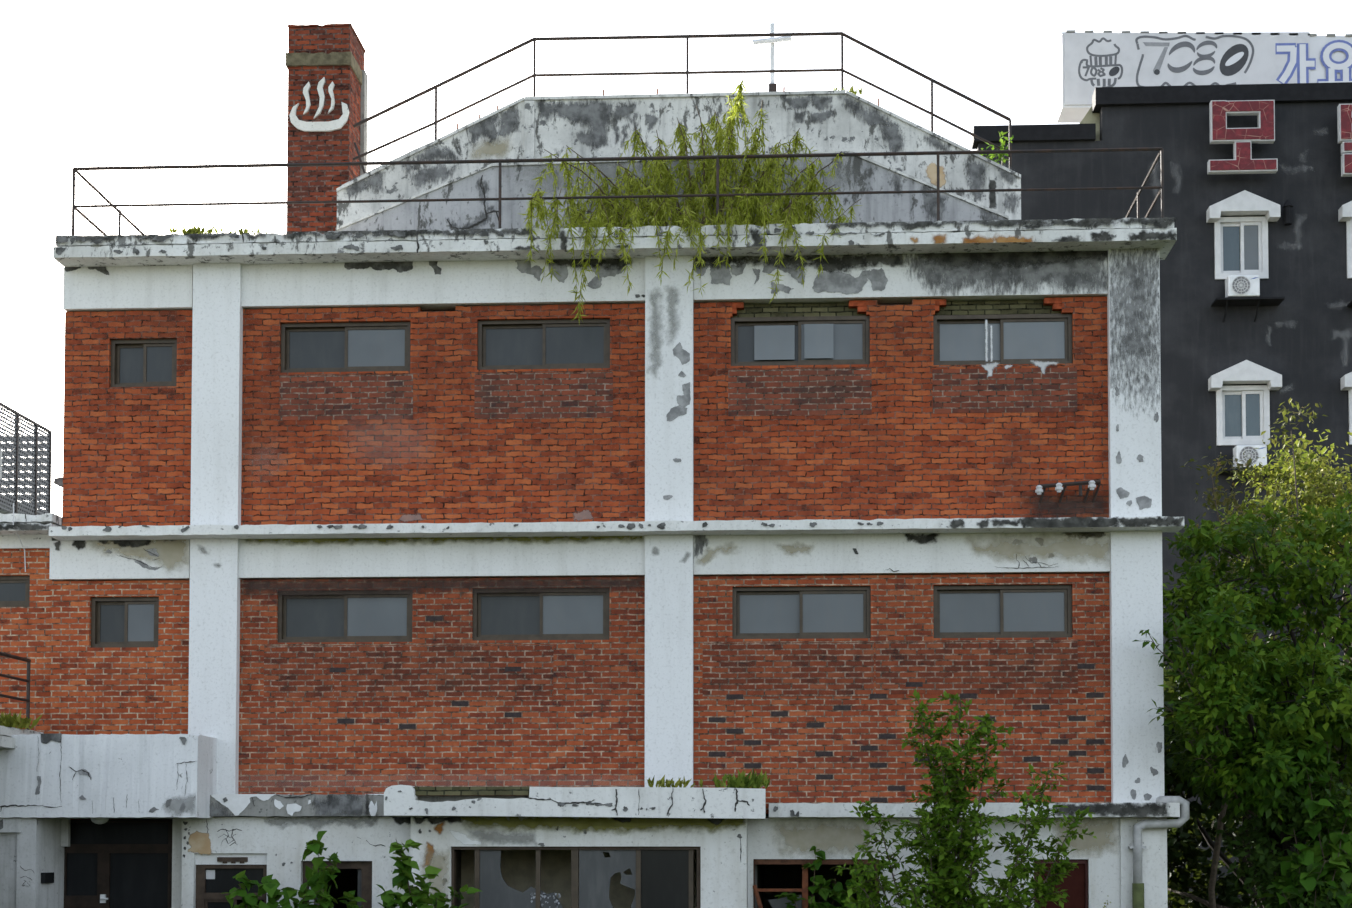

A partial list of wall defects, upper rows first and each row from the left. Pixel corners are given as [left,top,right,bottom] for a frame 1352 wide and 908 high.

water stain [344,172,383,198]
water stain [402,146,458,187]
water stain [465,109,519,155]
water stain [536,99,703,191]
water stain [783,95,903,195]
peeling [55,234,172,275]
peeling [325,230,413,273]
water stain [693,162,1177,410]
peeling [666,342,691,421]
peeling [211,794,311,816]
crack [528,789,750,861]
peeling [1130,767,1158,800]